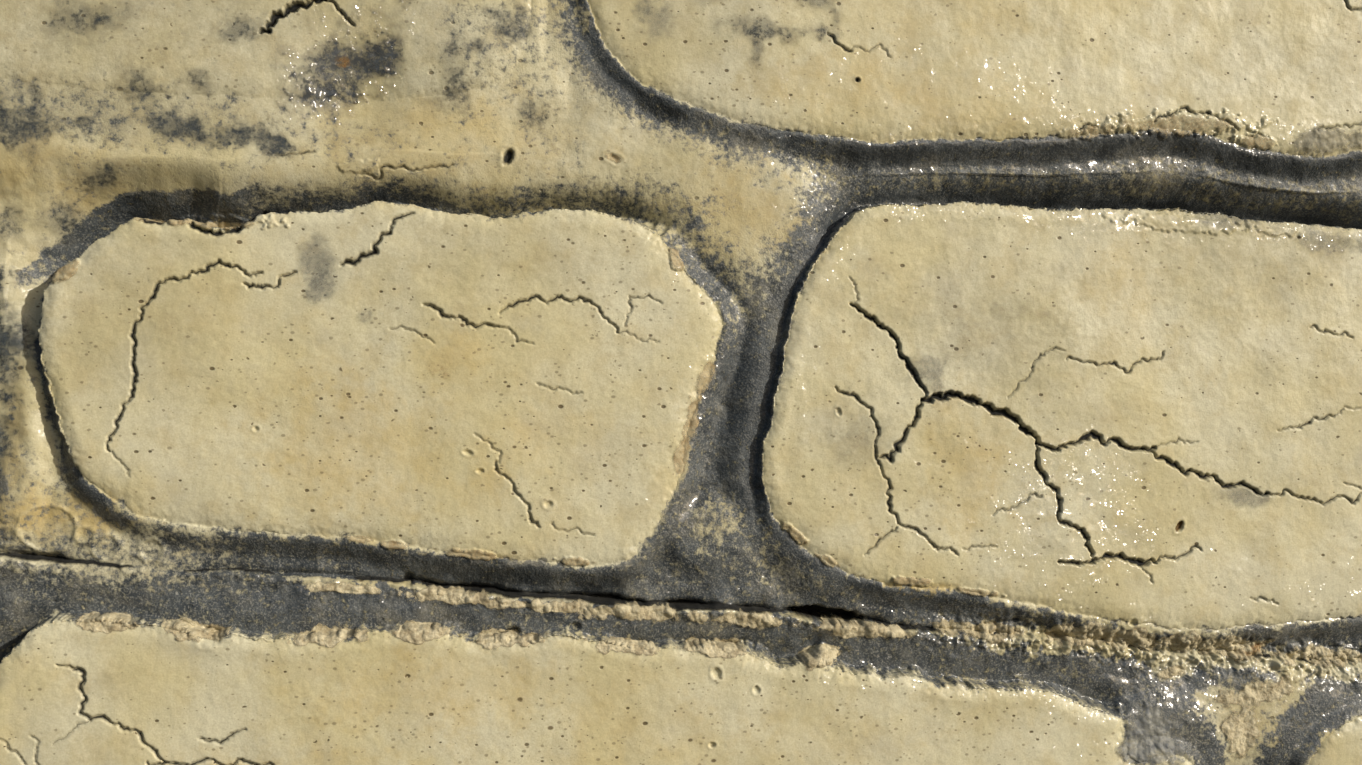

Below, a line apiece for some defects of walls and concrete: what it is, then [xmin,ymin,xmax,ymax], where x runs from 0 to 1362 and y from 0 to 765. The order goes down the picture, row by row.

crack [261,0,354,34]
damp [290,32,403,107]
damp [0,85,51,149]
damp [146,112,293,155]
damp [0,304,31,382]
crack [107,214,294,472]
crack [840,293,1361,581]
spalling [76,611,138,634]
spalling [161,616,231,642]
crack [355,576,785,613]
spalling [392,585,912,671]
spalling [1045,621,1362,765]